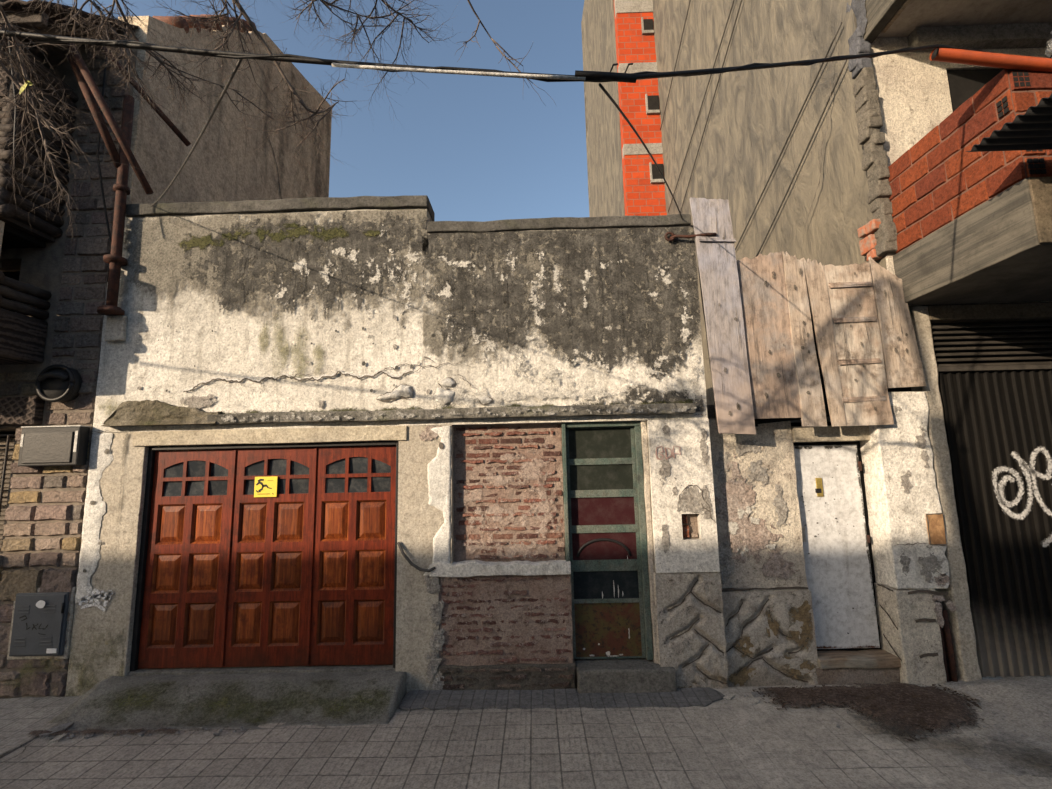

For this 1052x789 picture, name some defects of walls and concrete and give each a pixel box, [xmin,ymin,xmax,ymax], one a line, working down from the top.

peeling [75,433,113,603]
water stain [221,406,422,414]
crack [183,357,473,392]
water stain [124,209,704,412]
peeling [221,246,703,690]
peeling [658,428,802,587]